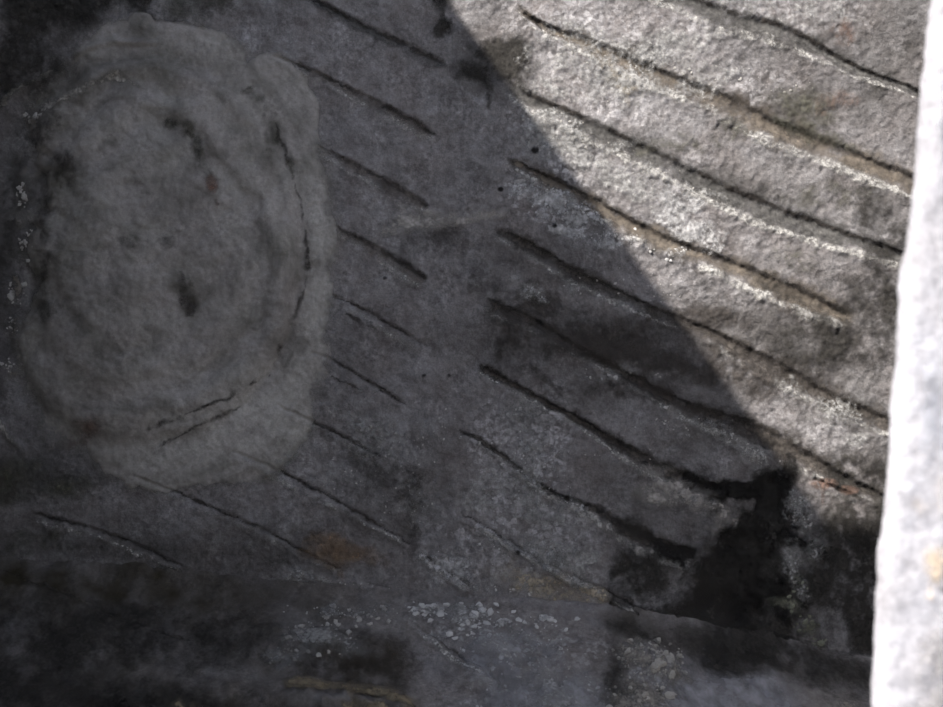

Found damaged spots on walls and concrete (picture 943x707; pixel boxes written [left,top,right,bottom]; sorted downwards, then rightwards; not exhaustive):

damp [0,0,147,106]
crack [312,0,445,67]
damp [433,0,452,37]
damp [458,36,564,106]
damp [543,18,719,103]
crack [519,0,920,198]
crack [509,160,851,327]
crack [509,82,905,267]
crack [480,299,885,505]
crack [497,230,890,436]
crack [459,432,692,571]
damp [0,594,409,707]